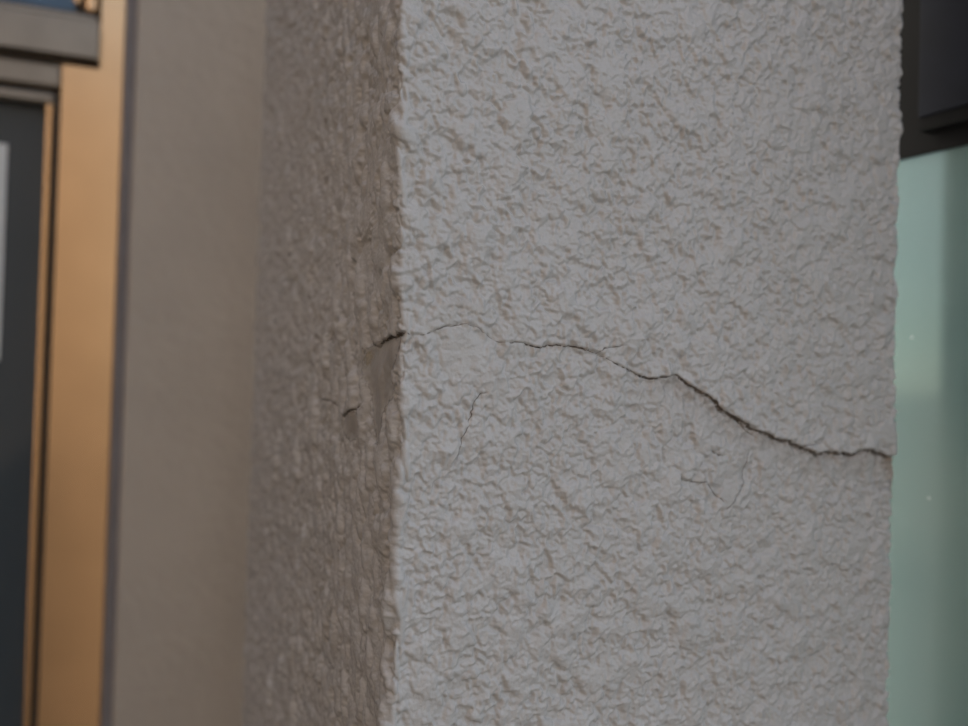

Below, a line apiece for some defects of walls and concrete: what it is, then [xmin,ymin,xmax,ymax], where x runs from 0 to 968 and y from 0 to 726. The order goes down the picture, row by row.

crack [380,323,891,509]